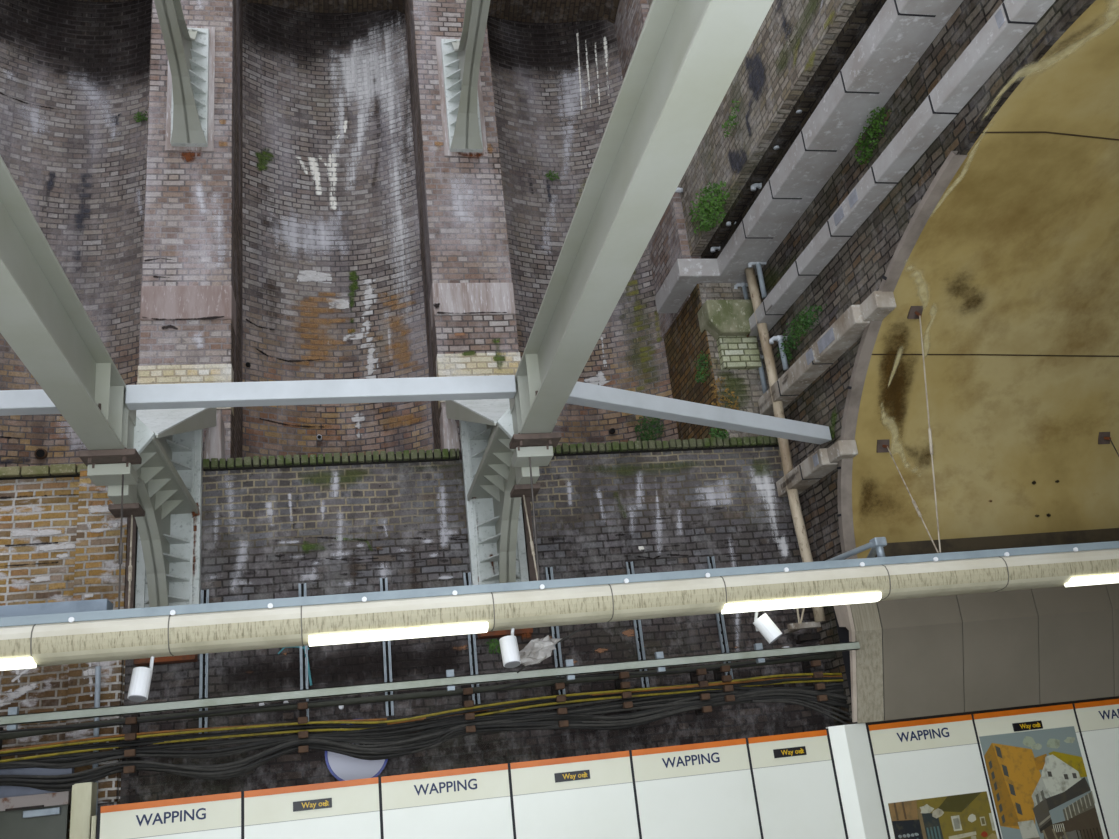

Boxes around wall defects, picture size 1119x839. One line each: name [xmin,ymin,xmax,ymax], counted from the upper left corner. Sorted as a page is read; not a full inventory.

damp [745,53,767,136]
damp [74,173,90,232]
damp [261,184,343,252]
damp [296,31,414,379]
damp [728,148,747,174]
damp [880,328,931,471]
damp [705,482,729,504]
damp [751,468,795,556]